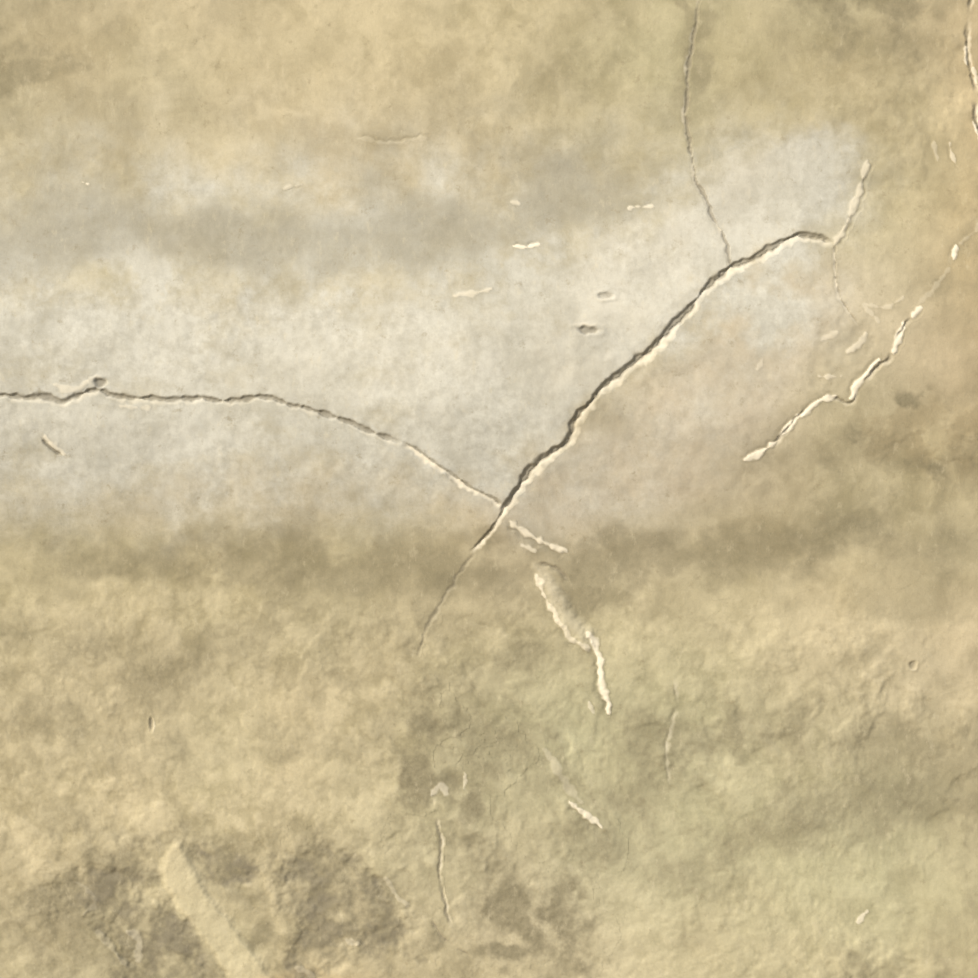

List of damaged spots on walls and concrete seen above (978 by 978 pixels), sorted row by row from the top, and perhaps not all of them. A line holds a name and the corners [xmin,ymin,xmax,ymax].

crack [962,0,978,144]
crack [931,140,961,173]
crack [0,0,876,659]
crack [741,222,978,462]
flaking render [529,560,613,719]